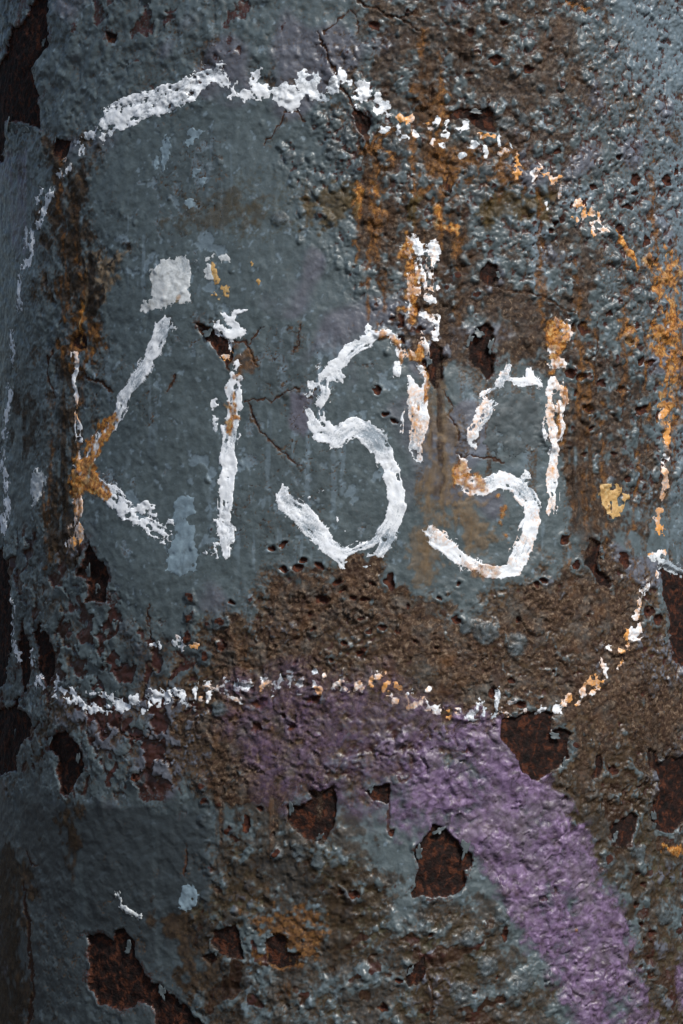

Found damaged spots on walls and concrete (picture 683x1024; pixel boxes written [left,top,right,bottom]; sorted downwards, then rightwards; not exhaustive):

spalling [0,0,49,162]
rust [0,133,131,570]
crack [244,387,302,466]
rust [169,0,683,857]
spalling [644,552,683,665]
spalling [0,548,56,775]
spalling [47,730,84,795]
spalling [287,786,337,840]
spalling [411,824,473,897]
spalling [500,701,572,781]
spalling [647,750,683,833]
spalling [86,928,203,1024]